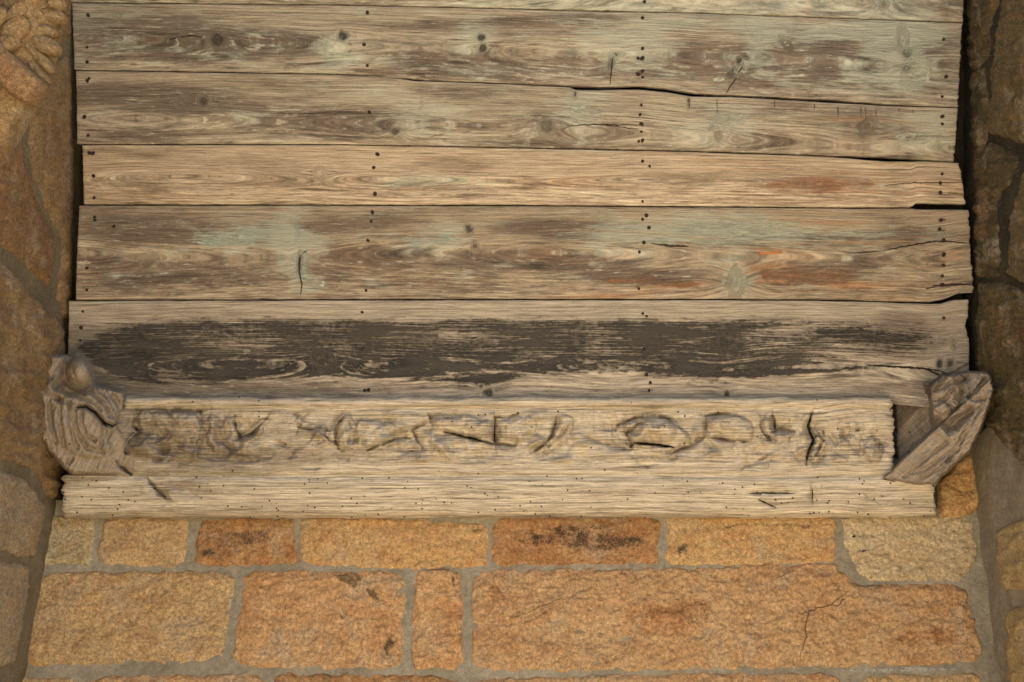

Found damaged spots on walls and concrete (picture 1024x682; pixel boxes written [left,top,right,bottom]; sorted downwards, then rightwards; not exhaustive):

crack [853,240,969,254]
crack [298,251,307,295]
crack [926,282,972,290]
leakage [78,315,953,388]
crack [806,414,817,463]
crack [798,583,883,660]